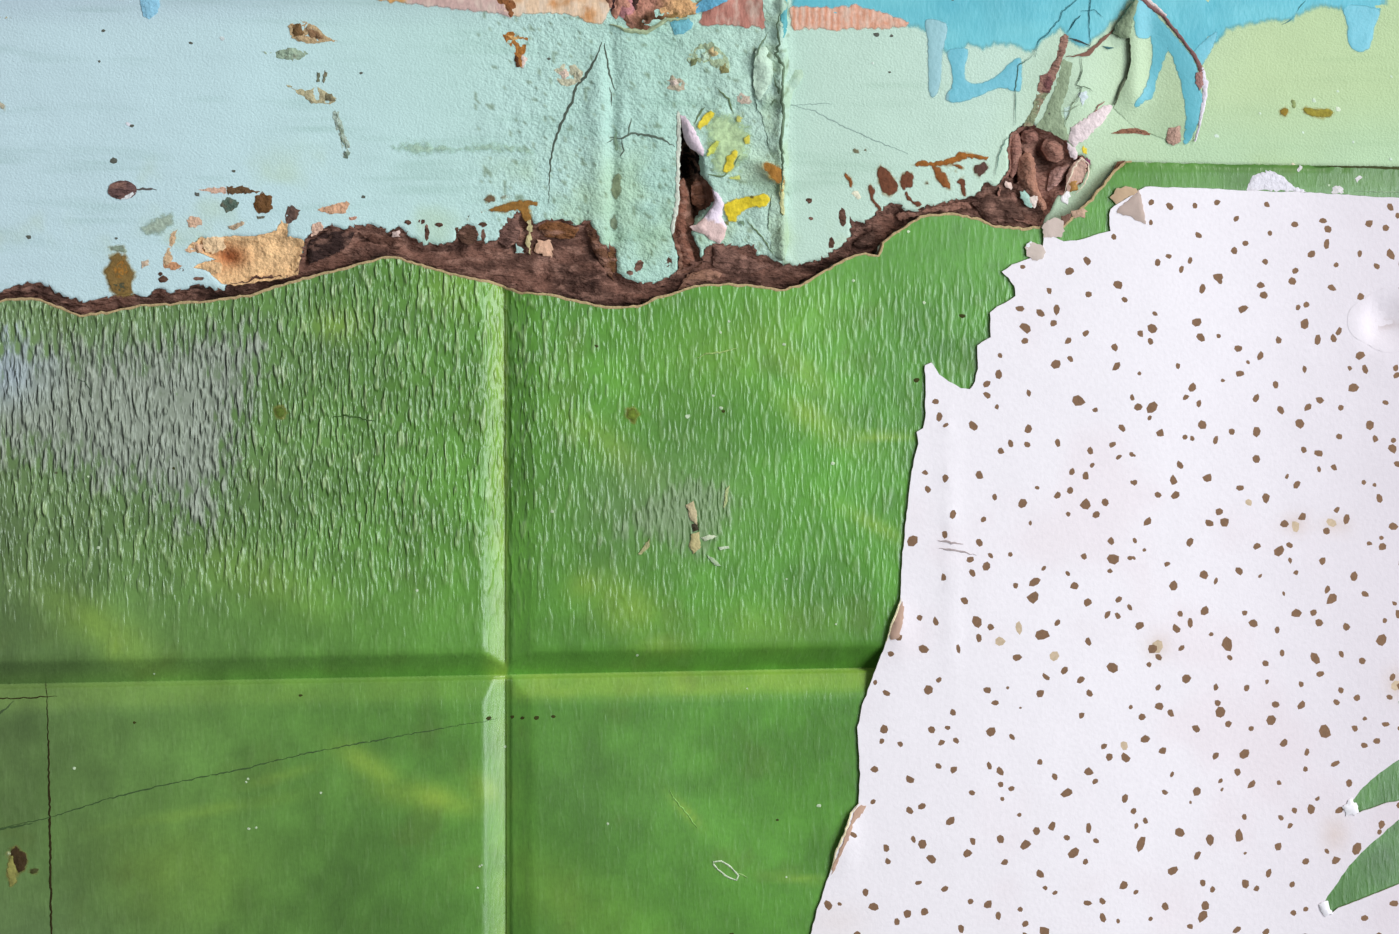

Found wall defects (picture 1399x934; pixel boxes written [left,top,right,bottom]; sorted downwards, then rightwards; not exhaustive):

spalling [0,0,1209,315]
crack [548,42,734,197]